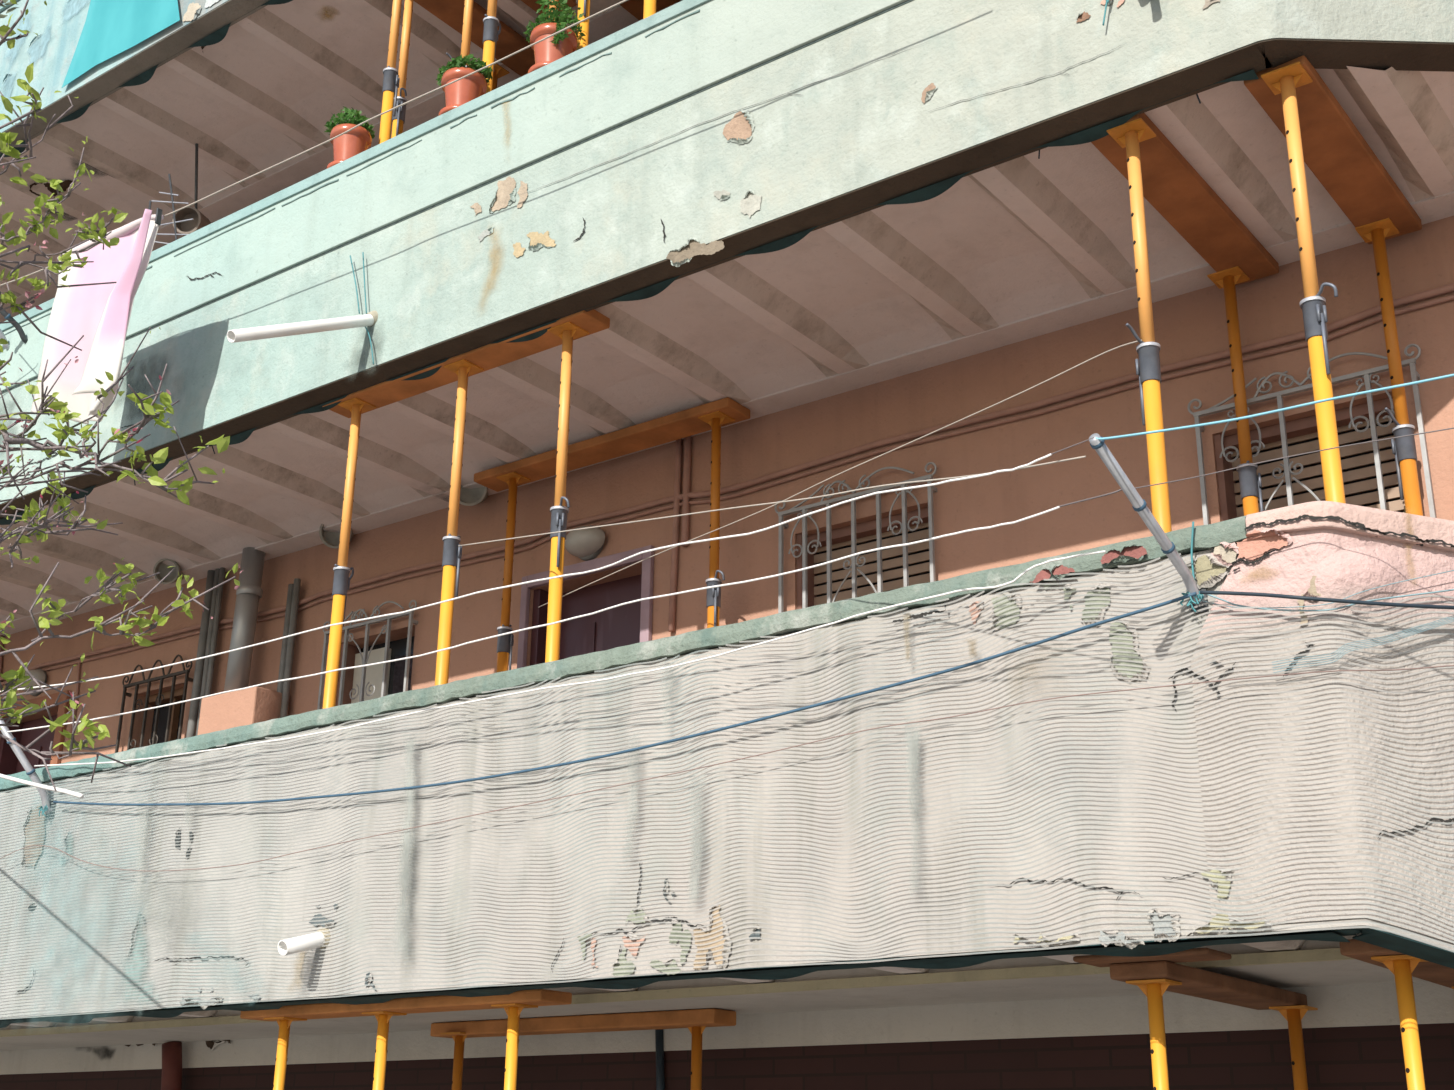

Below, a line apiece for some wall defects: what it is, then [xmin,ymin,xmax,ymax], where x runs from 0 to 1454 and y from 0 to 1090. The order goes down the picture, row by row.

peeling [183,0,219,22]
peeling [723,110,755,144]
peeling [470,176,528,243]
peeling [713,189,762,218]
peeling [513,231,556,258]
spalling [666,237,725,267]
peeling [1186,527,1293,589]
crack [1211,514,1454,573]
crack [1169,662,1236,711]
crack [1377,817,1454,839]
crack [1010,872,1199,901]
peeling [577,878,731,976]